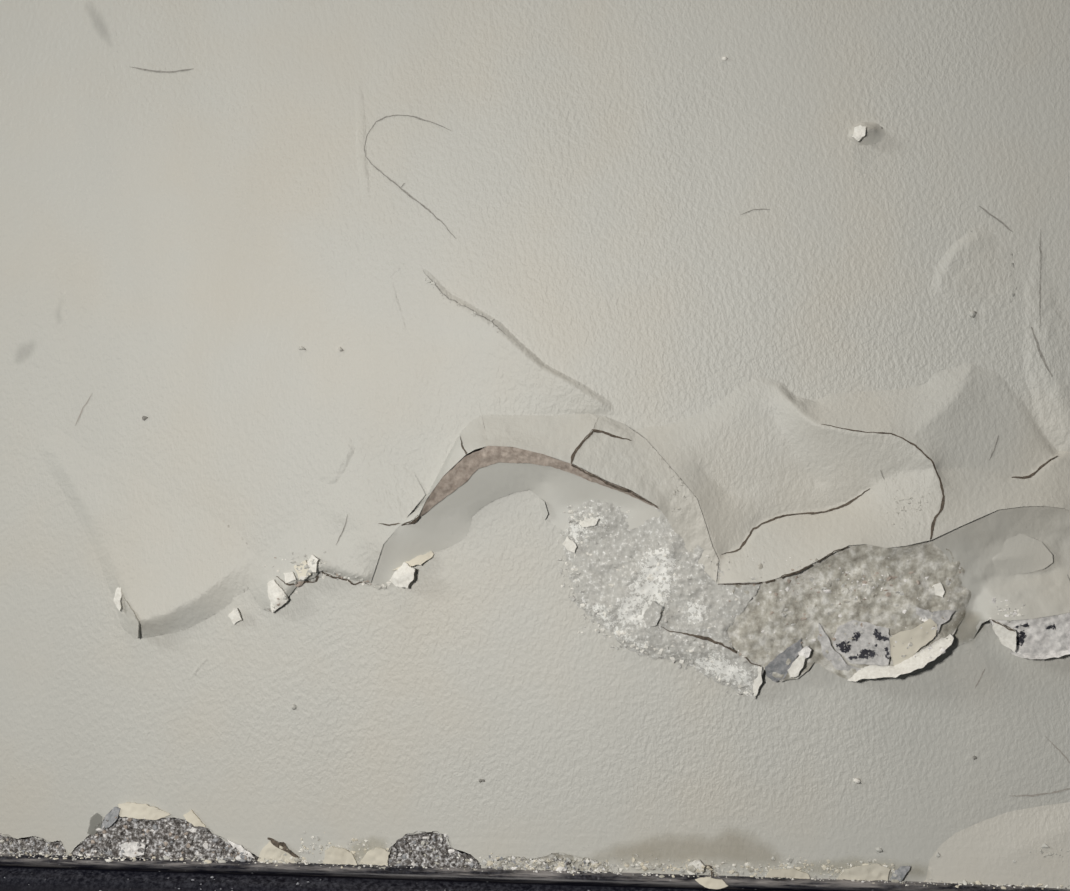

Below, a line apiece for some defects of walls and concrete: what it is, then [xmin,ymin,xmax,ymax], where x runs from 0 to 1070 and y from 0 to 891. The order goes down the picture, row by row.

crack [364,115,455,238]
peeling [249,414,730,613]
peeling [228,608,242,625]
spalling [727,506,1070,697]
spalling [0,802,1070,889]